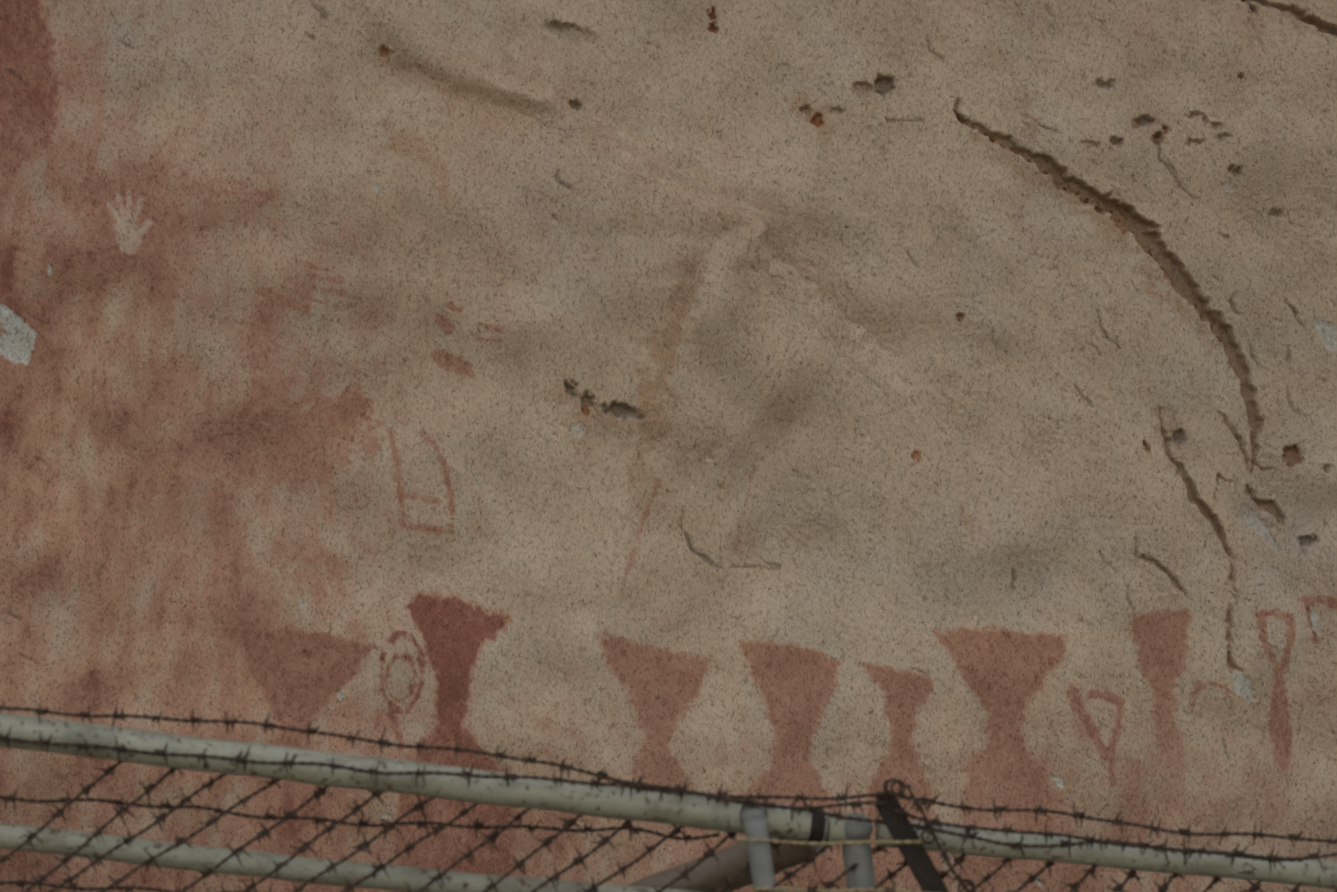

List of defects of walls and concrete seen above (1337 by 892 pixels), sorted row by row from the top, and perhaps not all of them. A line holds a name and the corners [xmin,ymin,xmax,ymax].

crack [925,36,946,64]
crack [1233,0,1337,37]
peeling [0,302,39,368]
crack [884,97,1310,674]